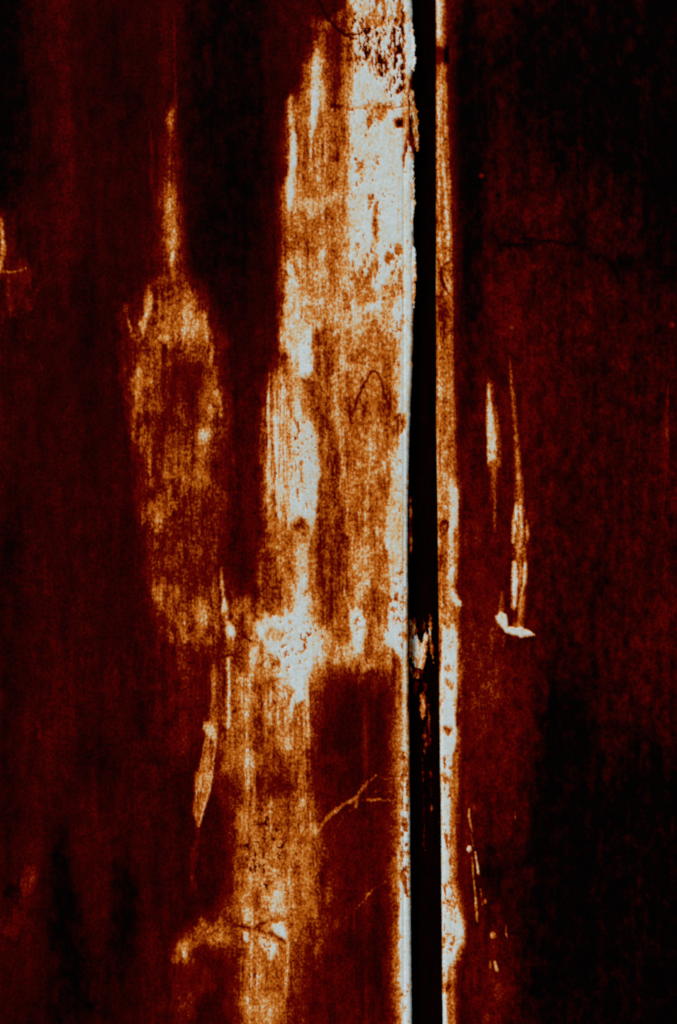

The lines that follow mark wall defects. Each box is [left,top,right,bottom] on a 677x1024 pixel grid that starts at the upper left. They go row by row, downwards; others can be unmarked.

corrosion [113,0,404,1024]
peeling [240,0,485,1024]
peeling [484,354,538,653]
corrosion [0,858,39,946]
crack [318,774,395,839]